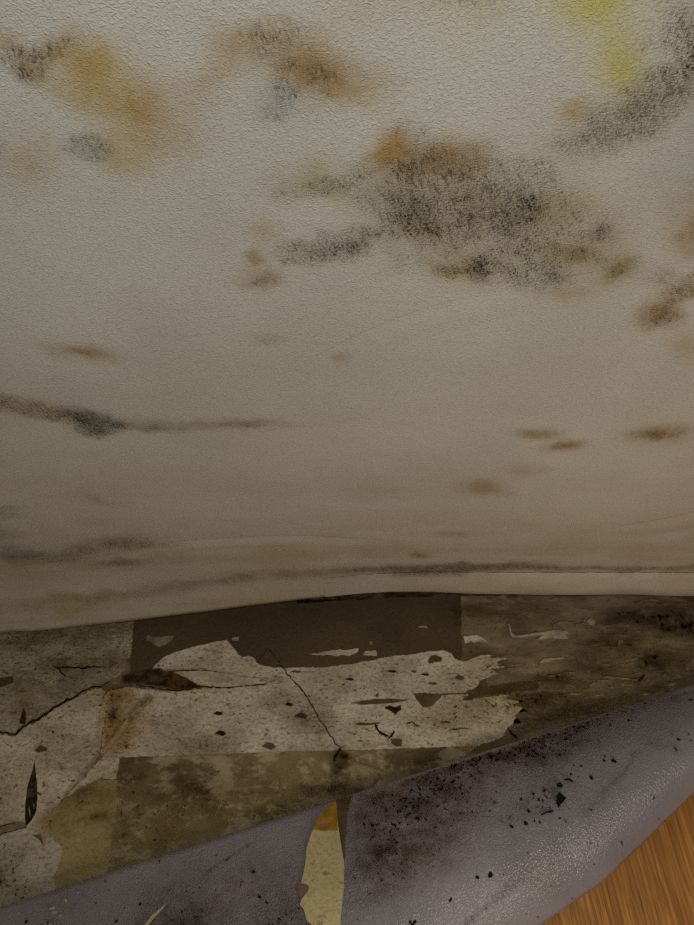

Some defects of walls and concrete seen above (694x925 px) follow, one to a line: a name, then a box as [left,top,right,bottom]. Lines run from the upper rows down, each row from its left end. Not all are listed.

water stain [1,38,71,83]
water stain [560,12,694,152]
water stain [279,142,630,290]
water stain [0,396,125,439]
peeling [145,635,174,647]
crack [0,665,110,735]
crack [136,650,344,761]
peeling [356,722,402,747]
peeling [354,655,540,715]